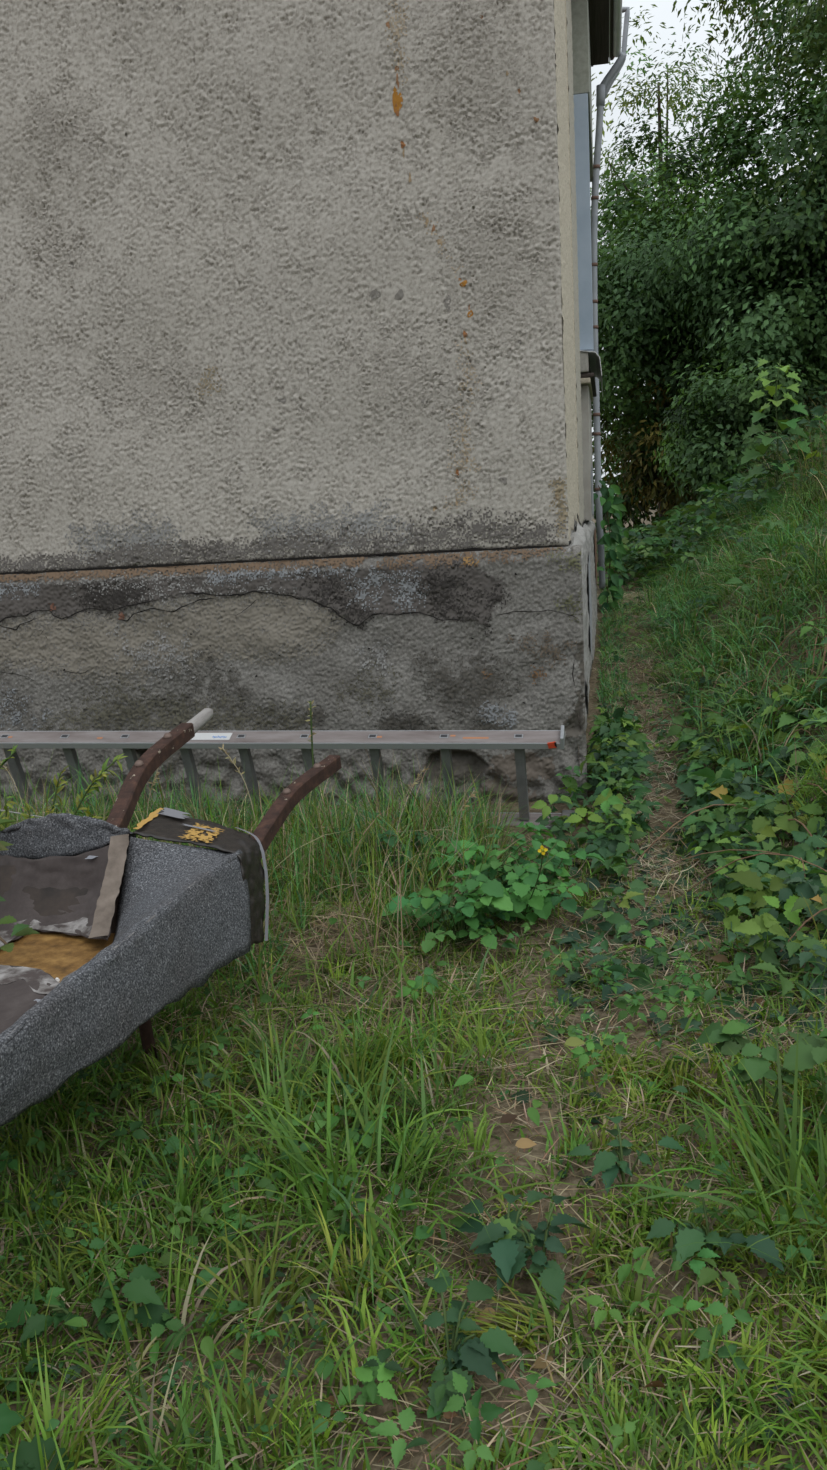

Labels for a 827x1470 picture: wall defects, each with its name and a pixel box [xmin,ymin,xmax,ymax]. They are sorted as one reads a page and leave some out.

corrosion [384,0,410,116]
crack [0,513,589,638]
damp [0,477,592,731]